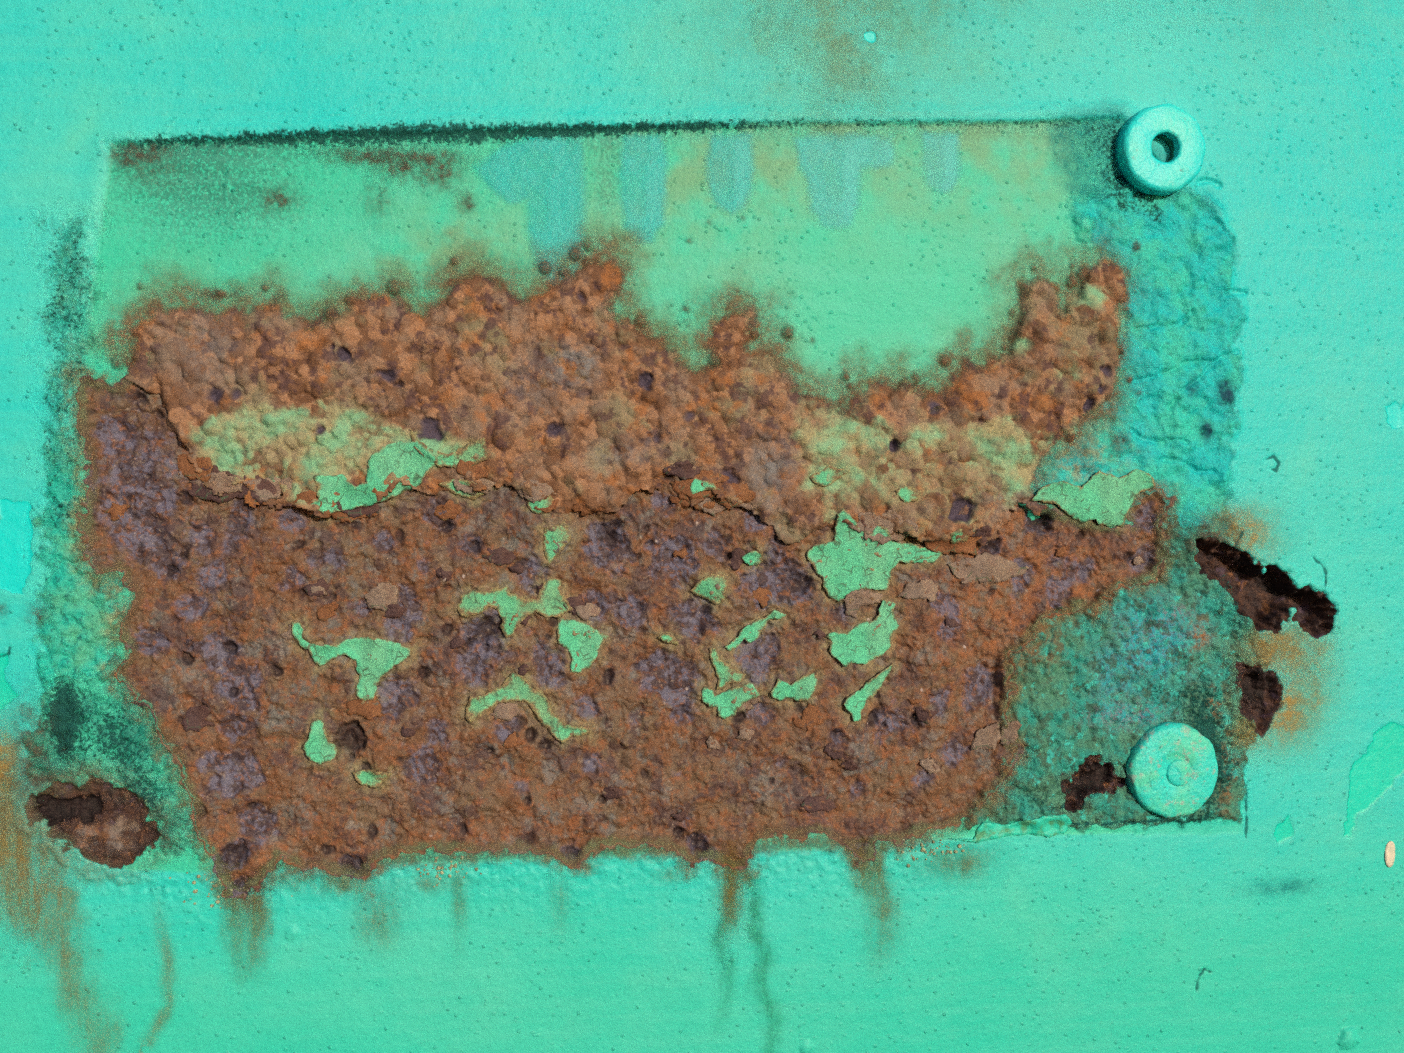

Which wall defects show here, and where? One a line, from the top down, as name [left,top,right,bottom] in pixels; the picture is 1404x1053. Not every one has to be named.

corrosion [68,236,1270,936]
corrosion [0,744,72,963]
peeling [1344,722,1404,837]